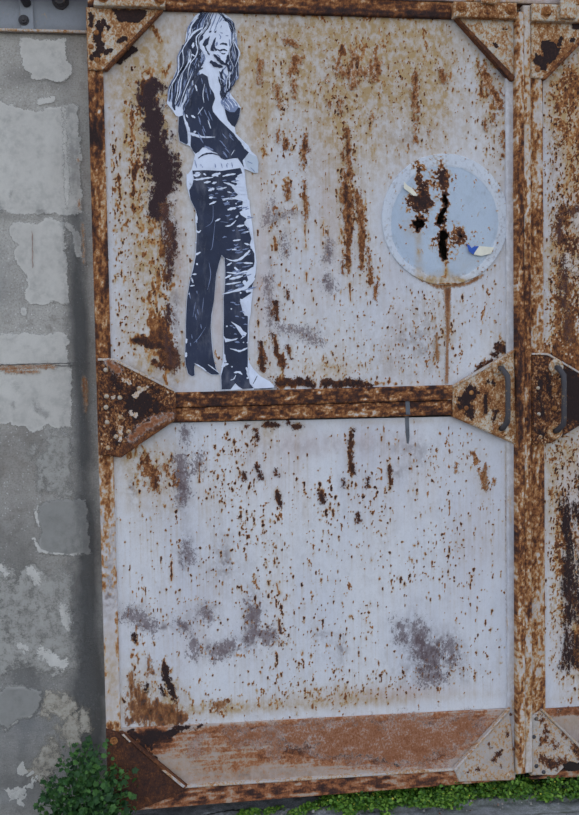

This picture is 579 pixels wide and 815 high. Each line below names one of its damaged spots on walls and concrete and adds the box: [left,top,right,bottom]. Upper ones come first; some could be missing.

flaking render [19,37,73,82]
rust [87,8,147,65]
flaking render [0,96,83,317]
rust [131,75,183,286]
rust [339,127,381,301]
rust [131,297,186,375]
rust [256,332,374,390]
flaking render [0,331,92,557]
flaking render [0,562,81,679]
rust [554,463,579,676]
flaking render [4,688,94,807]
rust [124,655,208,759]